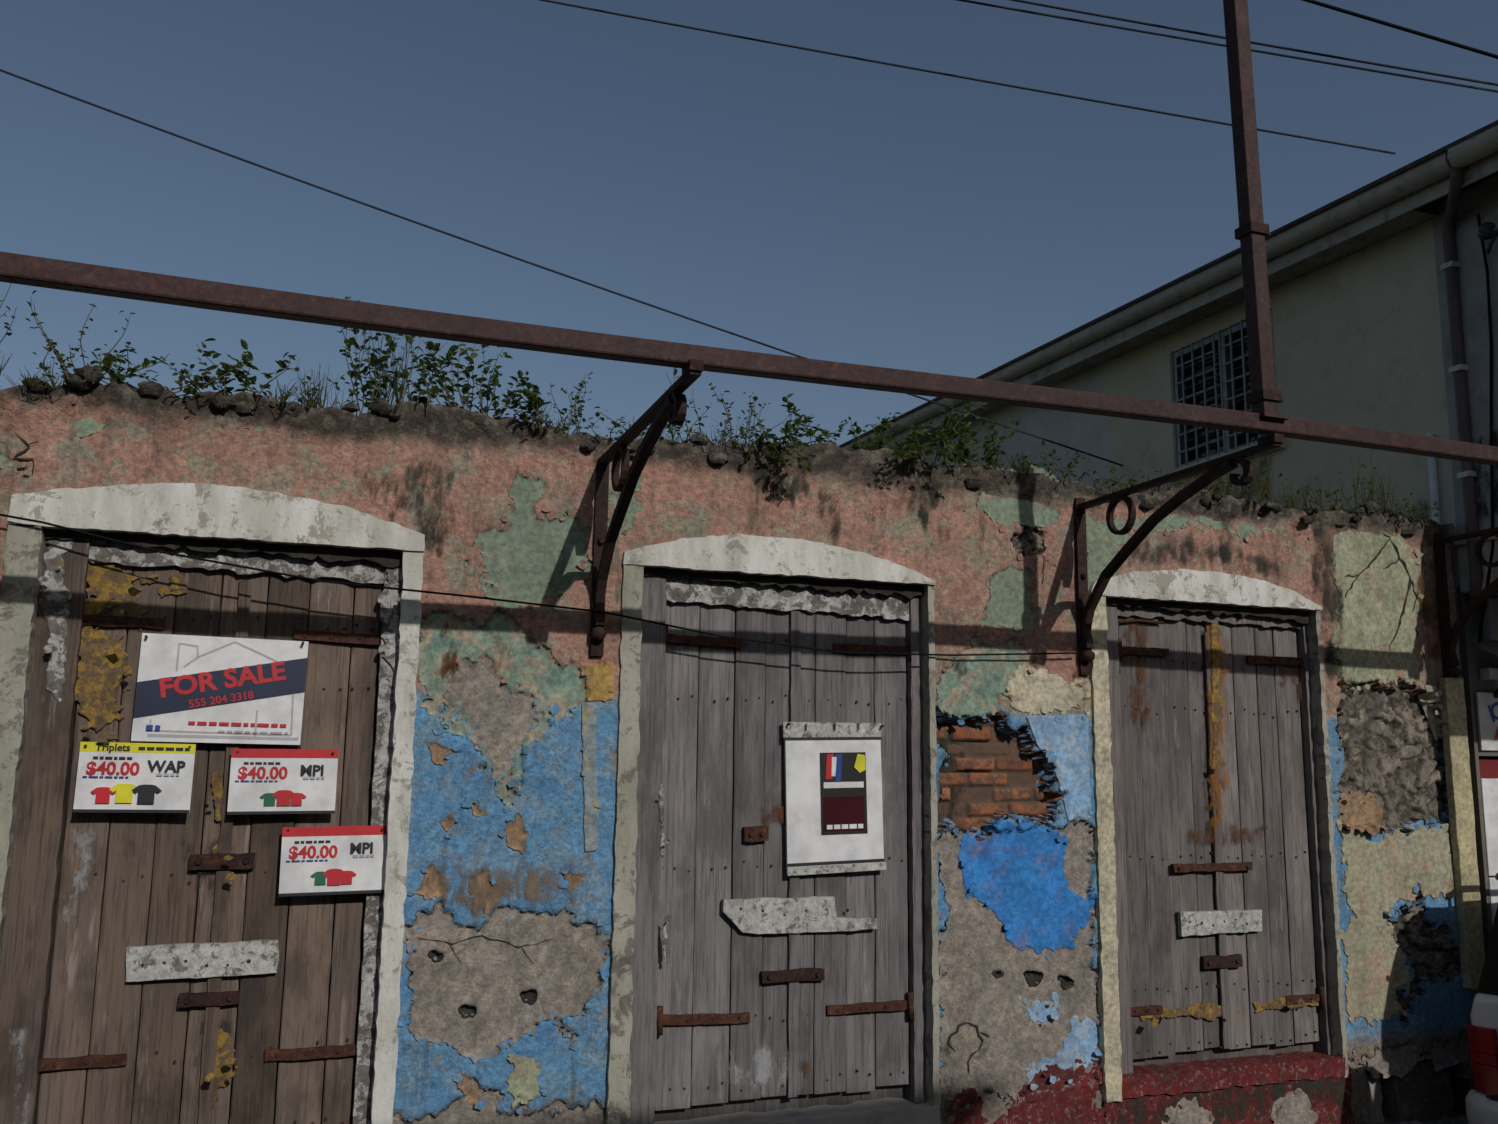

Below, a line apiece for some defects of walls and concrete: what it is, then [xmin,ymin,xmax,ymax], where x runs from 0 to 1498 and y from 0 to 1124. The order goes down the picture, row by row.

water stain [754,463,841,542]
water stain [904,481,949,537]
peeling [38,538,187,740]
peeling [378,566,403,675]
peeling [416,471,643,854]
spalling [924,456,1109,1124]
rust [1190,627,1267,845]
spalling [1333,670,1449,836]
spalling [393,863,611,1124]
spalling [1340,887,1472,1082]
peeling [1161,1097,1215,1124]
peeling [1271,1088,1318,1124]